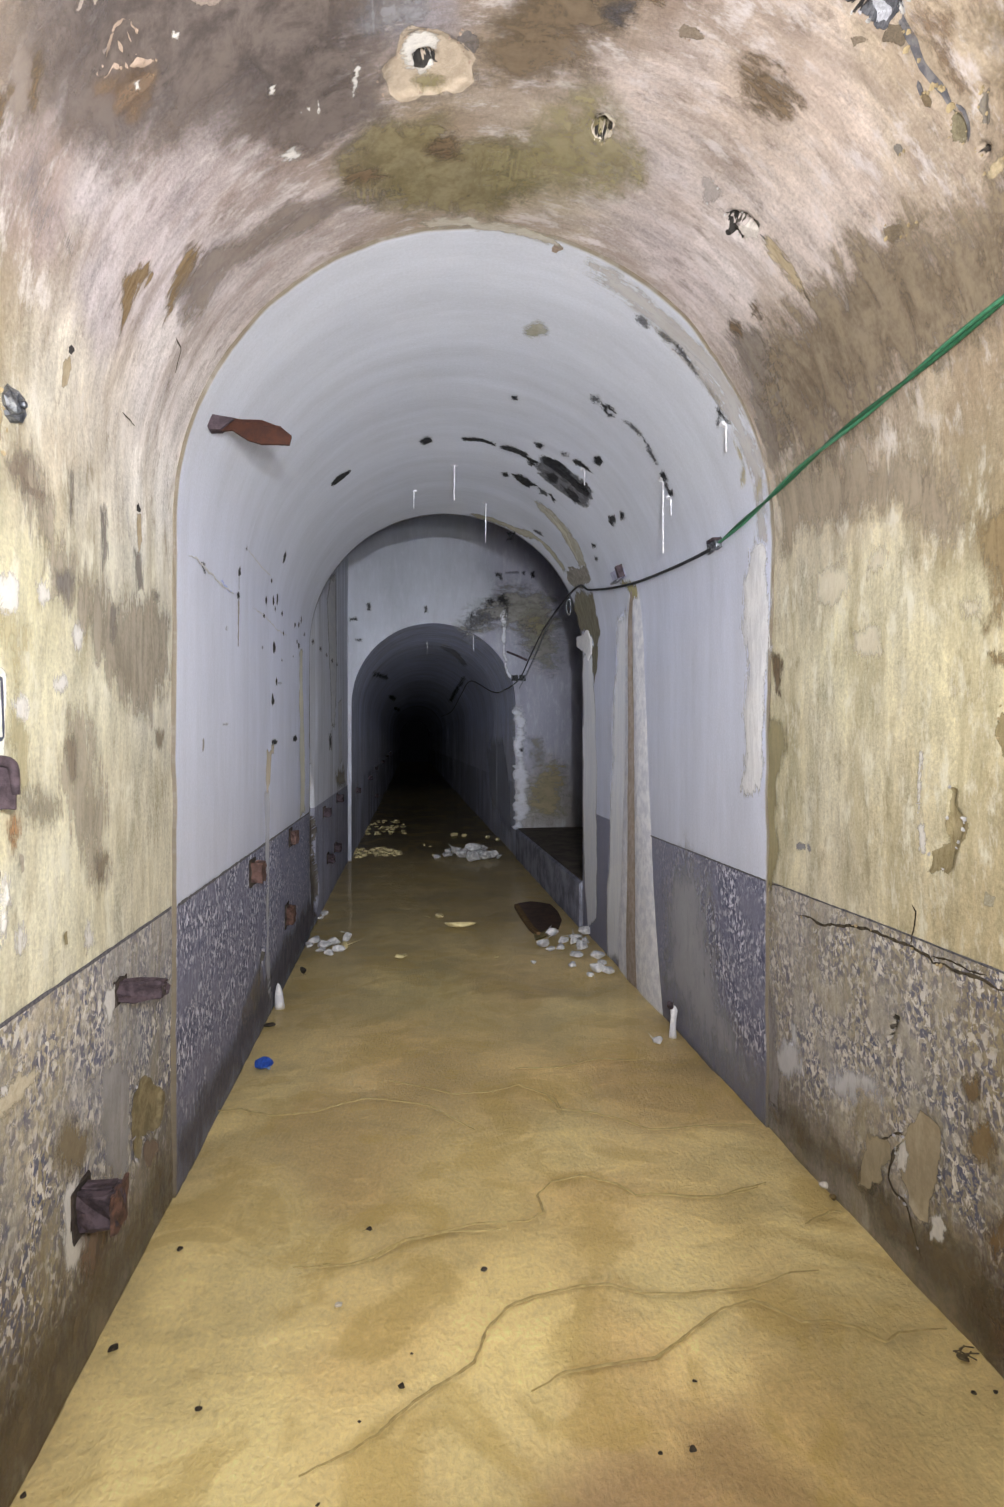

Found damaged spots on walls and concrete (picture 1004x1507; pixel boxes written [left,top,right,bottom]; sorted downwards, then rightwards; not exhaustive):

spalling [95,18,157,123]
spalling [376,25,479,103]
spalling [846,0,911,47]
rust [207,414,292,446]
water stain [459,571,563,678]
peeling [995,705,1004,757]
water stain [488,612,626,960]
peeling [916,751,969,874]
crack [768,883,1004,991]
spalling [858,1110,947,1243]